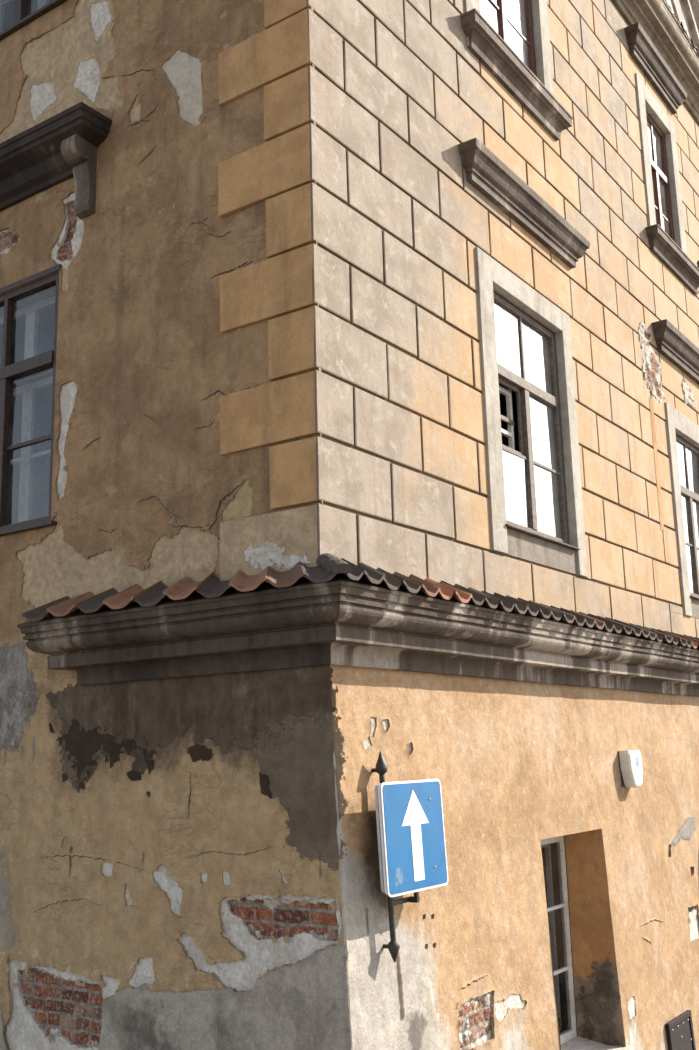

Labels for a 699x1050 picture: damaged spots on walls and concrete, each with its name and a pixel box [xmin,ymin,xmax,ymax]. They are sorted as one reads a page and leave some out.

flaking render [162,50,206,126]
flaking render [57,202,77,293]
flaking render [638,321,665,403]
crack [136,479,246,531]
flaking render [12,964,105,1048]
flaking render [457,991,496,1050]
damp [576,959,621,1046]